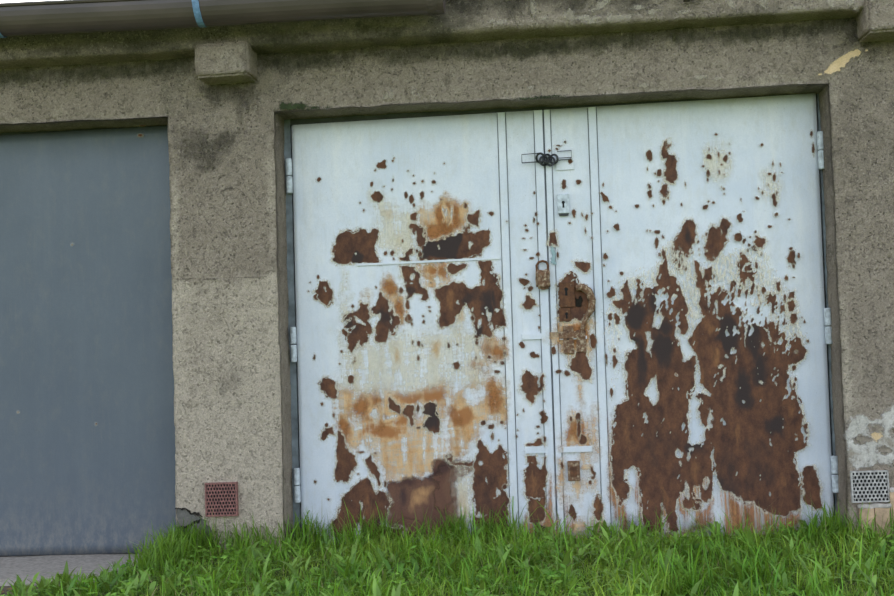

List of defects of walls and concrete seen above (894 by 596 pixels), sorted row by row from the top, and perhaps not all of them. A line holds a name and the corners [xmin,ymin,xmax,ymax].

peeling [818,48,868,75]
rust [646,138,686,207]
rust [701,148,731,195]
rust [308,275,334,307]
rust [318,161,824,540]
spalling [845,405,894,501]